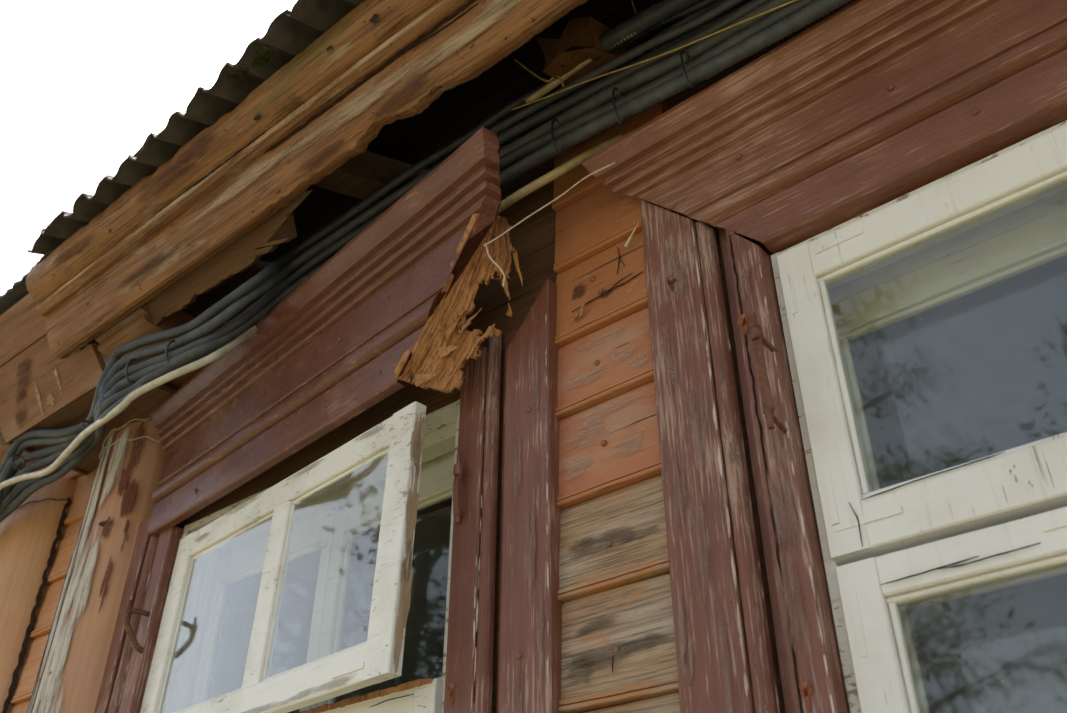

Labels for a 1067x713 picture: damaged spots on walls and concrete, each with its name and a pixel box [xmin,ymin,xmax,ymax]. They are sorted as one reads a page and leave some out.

peeling [701,303,711,379]
peeling [768,421,805,548]
peeling [27,421,144,713]
peeling [471,579,479,711]
peeling [723,495,748,697]
peeling [781,562,828,676]